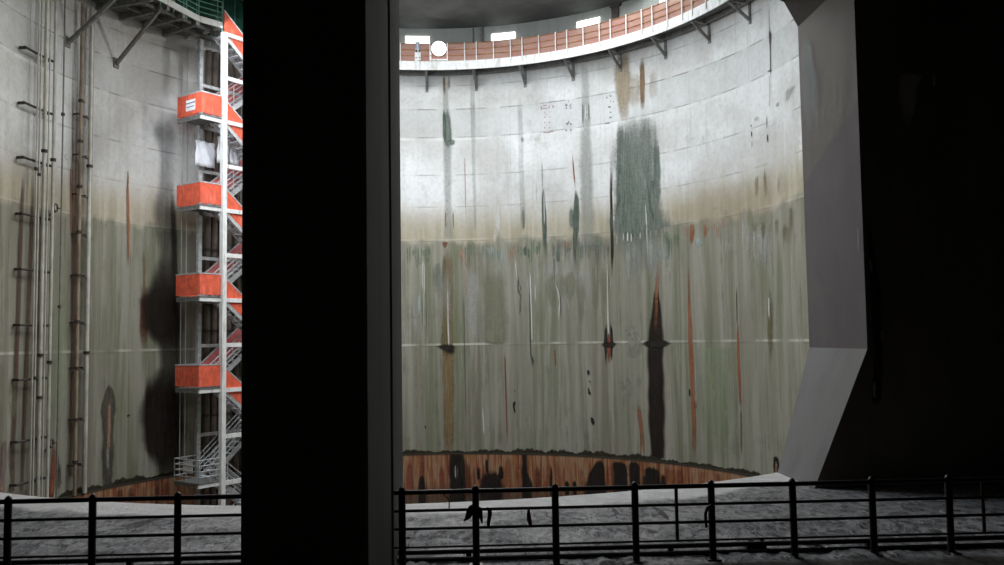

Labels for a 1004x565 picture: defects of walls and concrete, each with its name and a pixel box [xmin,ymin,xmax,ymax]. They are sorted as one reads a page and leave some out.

water stain [57,208,203,498]
water stain [403,105,761,476]
corrosion [688,286,697,447]